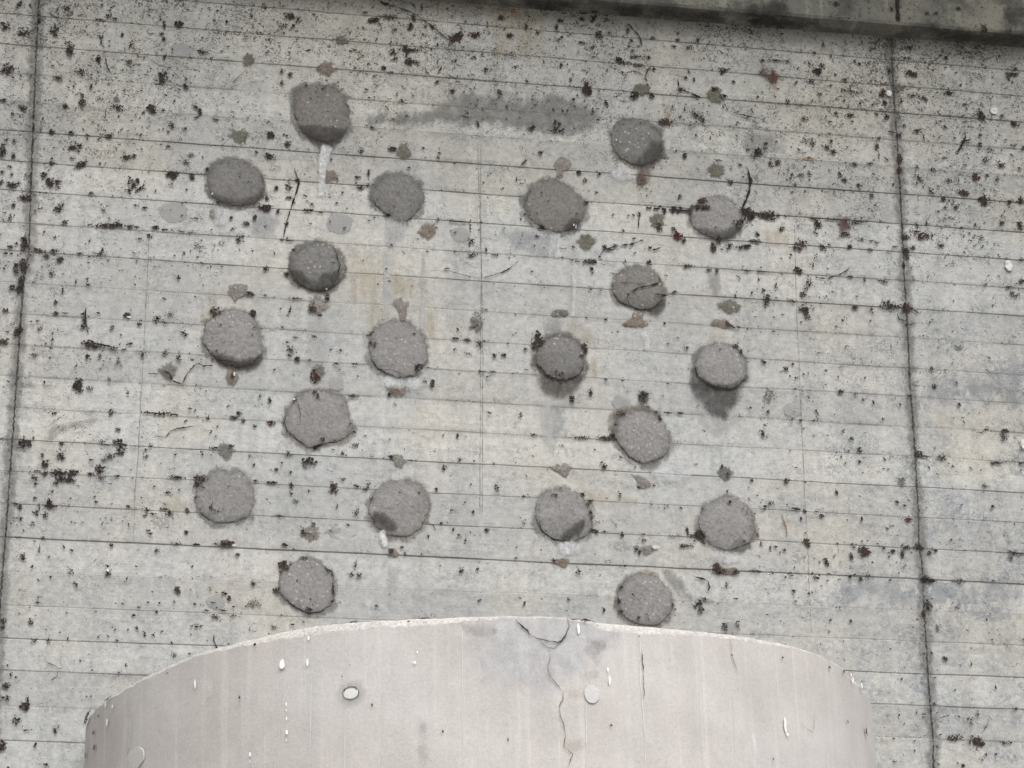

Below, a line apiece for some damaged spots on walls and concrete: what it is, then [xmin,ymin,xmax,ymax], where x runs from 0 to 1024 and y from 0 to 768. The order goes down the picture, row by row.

leakage [368,92,596,132]
crack [618,276,674,305]
leakage [691,369,746,429]
crack [516,619,597,766]